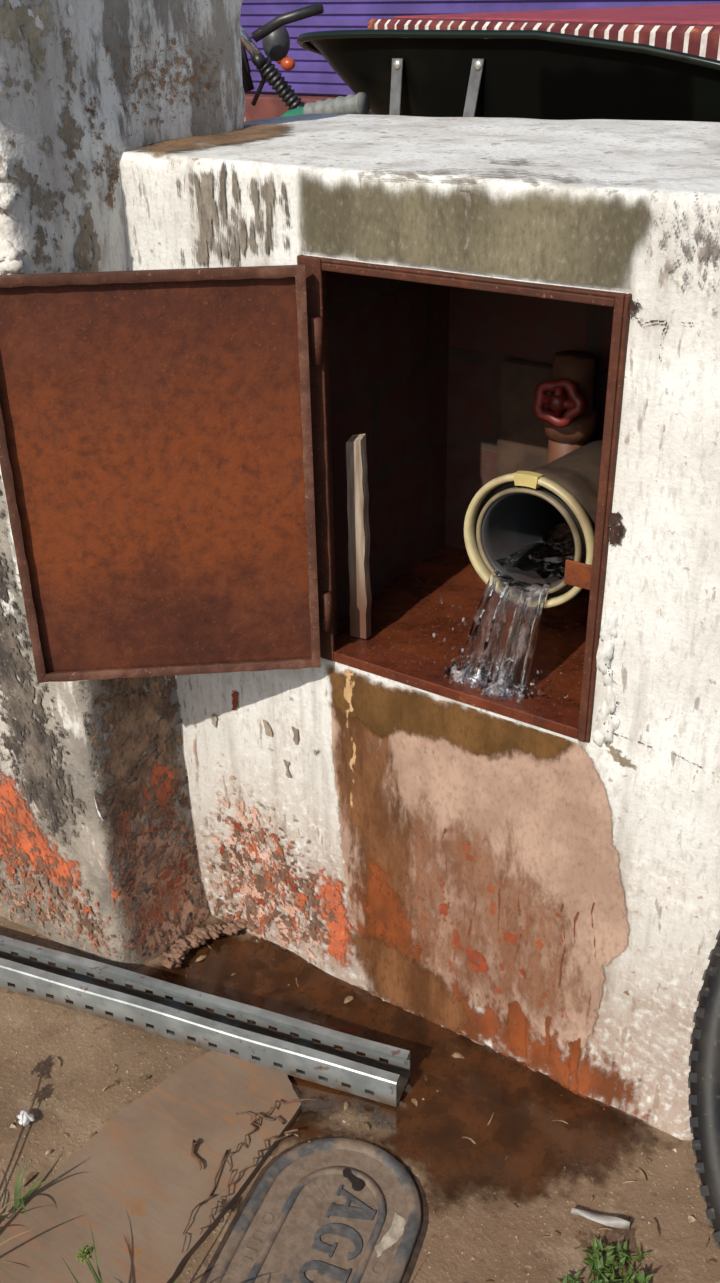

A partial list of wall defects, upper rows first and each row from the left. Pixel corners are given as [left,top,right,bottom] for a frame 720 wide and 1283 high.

peeling [0,0,121,274]
water stain [176,154,720,293]
peeling [0,491,188,902]
rust [0,724,650,1120]